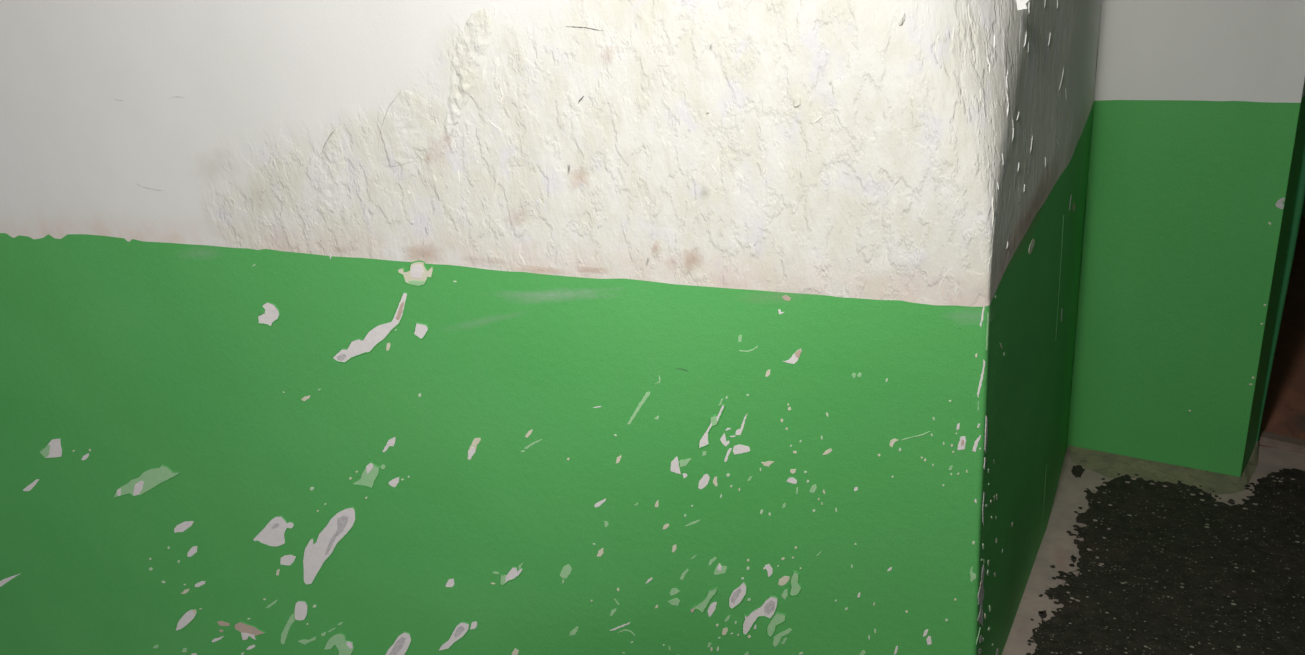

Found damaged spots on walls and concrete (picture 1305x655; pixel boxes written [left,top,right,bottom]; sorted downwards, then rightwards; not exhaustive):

peeling [1016,0,1058,13]
peeling [257,301,280,327]
peeling [332,260,434,363]
peeling [40,438,91,460]
peeling [670,396,773,498]
peeling [113,464,181,498]
peeling [168,521,197,563]
flaking render [212,437,412,655]
peeling [491,563,523,585]
peeling [175,608,202,631]
flaking render [438,621,477,651]
flaking render [655,555,802,655]